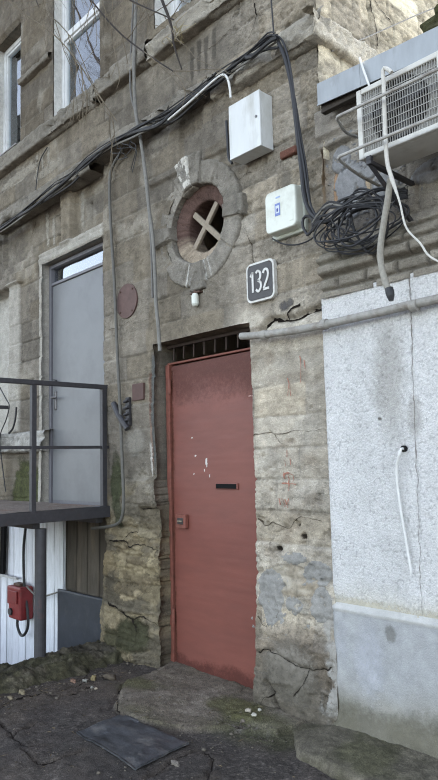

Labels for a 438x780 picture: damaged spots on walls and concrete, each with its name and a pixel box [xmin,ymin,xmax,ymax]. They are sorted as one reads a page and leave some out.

spalling [174,156,191,189]
crack [266,303,322,330]
crack [109,531,156,550]
crack [108,602,157,647]
flaking render [251,552,338,712]
crack [258,649,332,702]
crack [0,681,94,766]